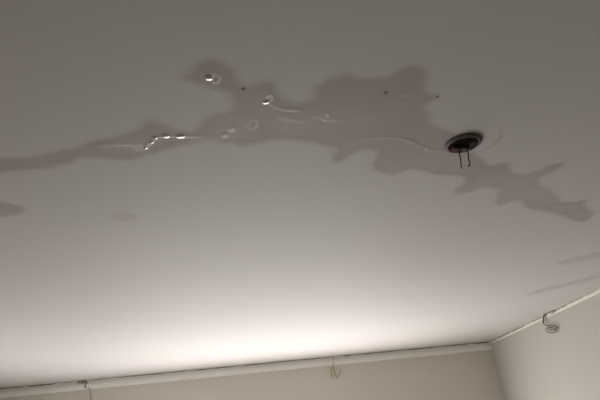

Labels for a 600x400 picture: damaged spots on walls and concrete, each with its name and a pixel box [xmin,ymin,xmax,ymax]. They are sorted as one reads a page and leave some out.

damp [0,55,599,224]